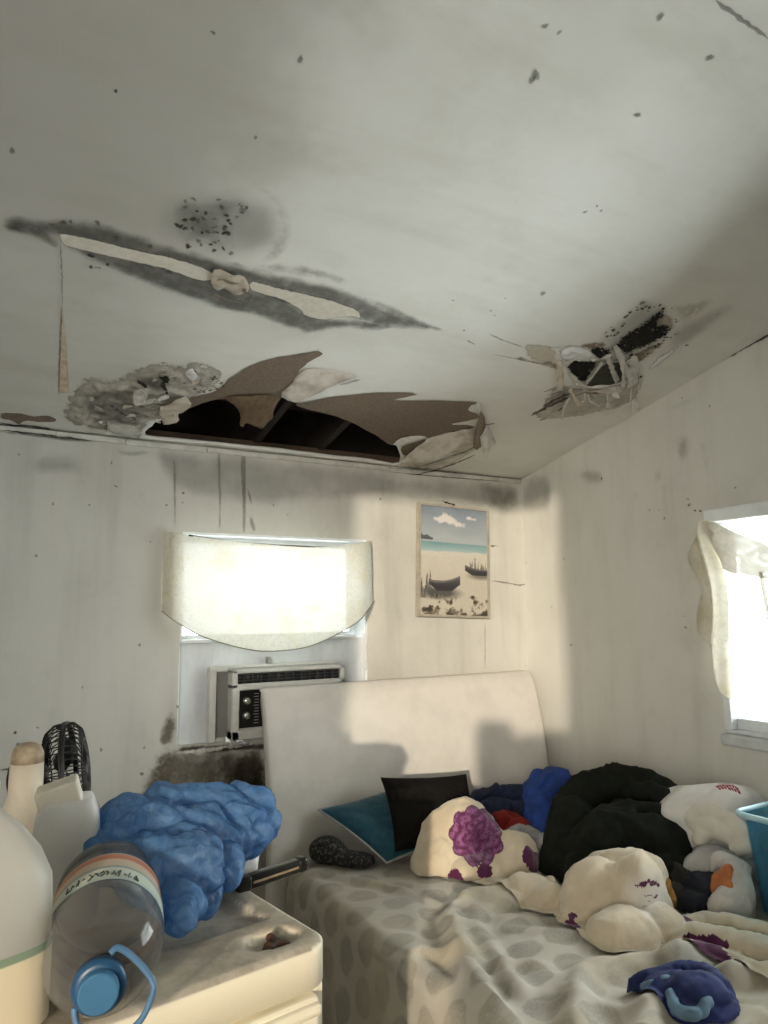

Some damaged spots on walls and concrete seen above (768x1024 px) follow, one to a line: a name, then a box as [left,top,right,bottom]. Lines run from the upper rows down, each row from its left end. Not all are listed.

leakage [10,198,414,330]
flaking render [168,369,216,391]
mould [141,752,264,793]